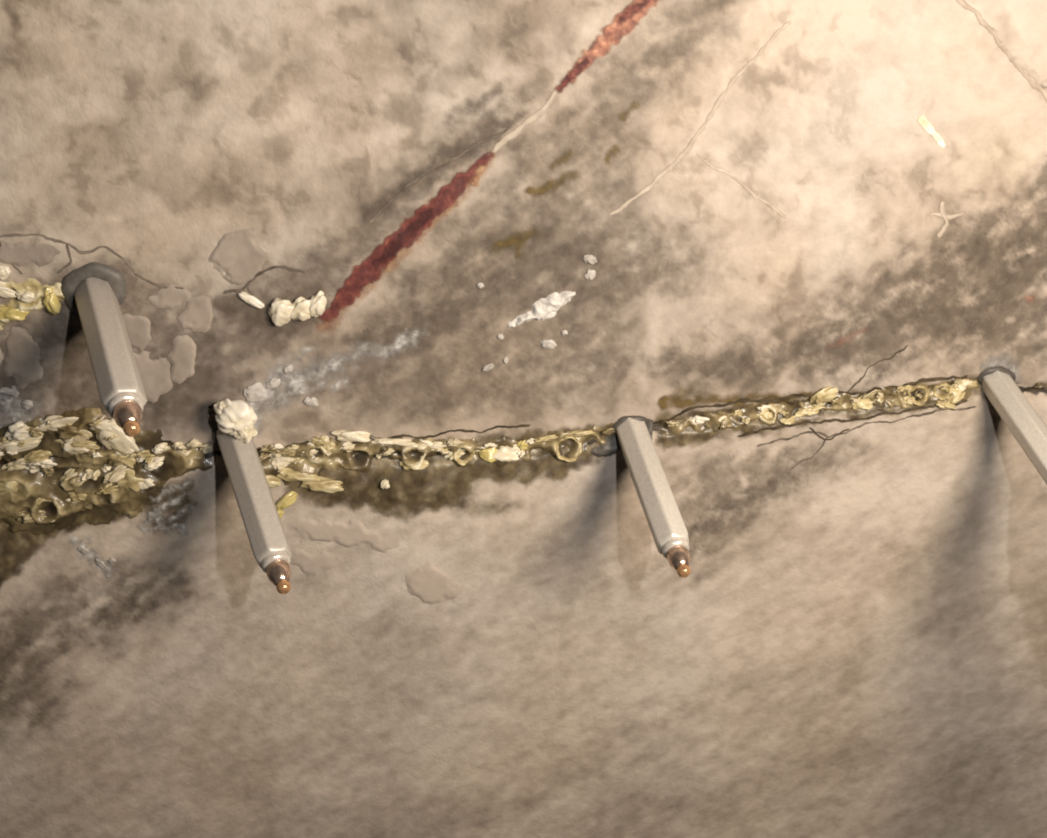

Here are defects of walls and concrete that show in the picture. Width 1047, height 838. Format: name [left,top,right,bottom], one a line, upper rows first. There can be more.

corrosion [556,0,658,92]
crack [0,234,184,289]
crack [223,266,305,299]
corrosion [319,152,494,330]
leakage [150,90,679,432]
leakage [660,213,1047,382]
crack [355,424,530,460]
leakage [656,383,952,448]
crack [652,345,980,470]
crack [1018,386,1047,394]
leakage [139,480,193,532]
leakage [0,518,122,587]